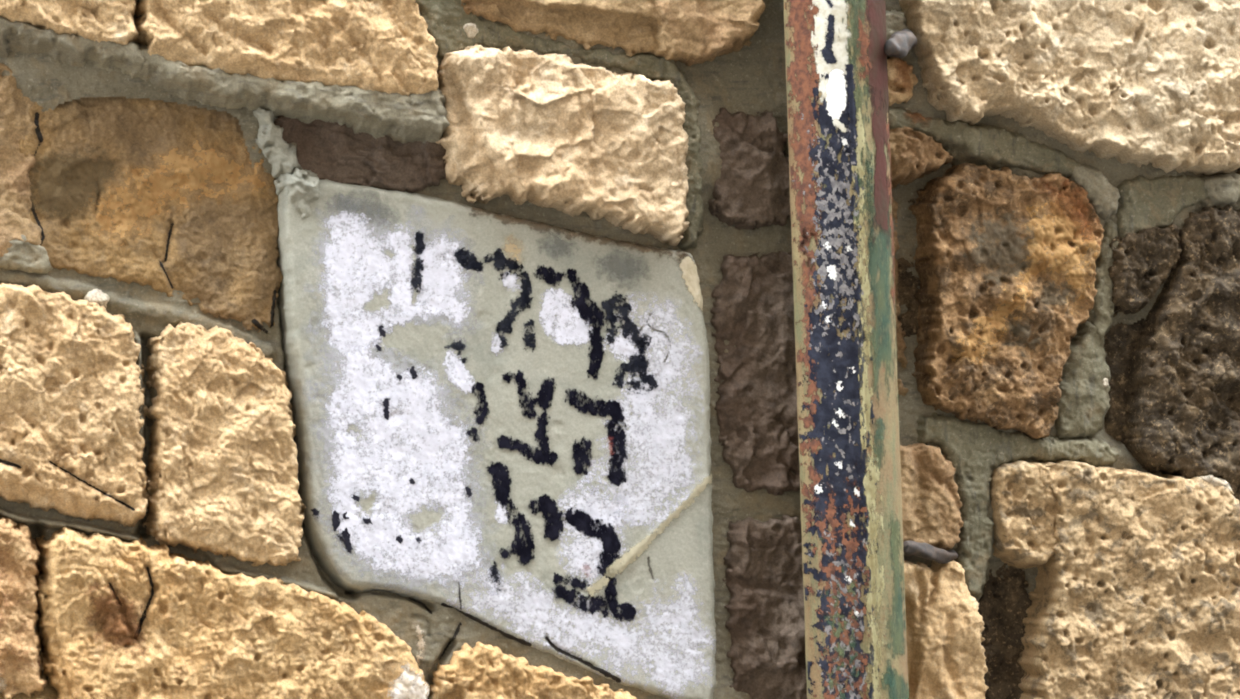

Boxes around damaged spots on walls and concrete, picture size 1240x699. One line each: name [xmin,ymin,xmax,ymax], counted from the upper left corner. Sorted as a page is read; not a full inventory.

corrosion [784,0,870,699]
peeling [792,0,909,699]
corrosion [856,4,873,92]
corrosion [886,116,895,313]